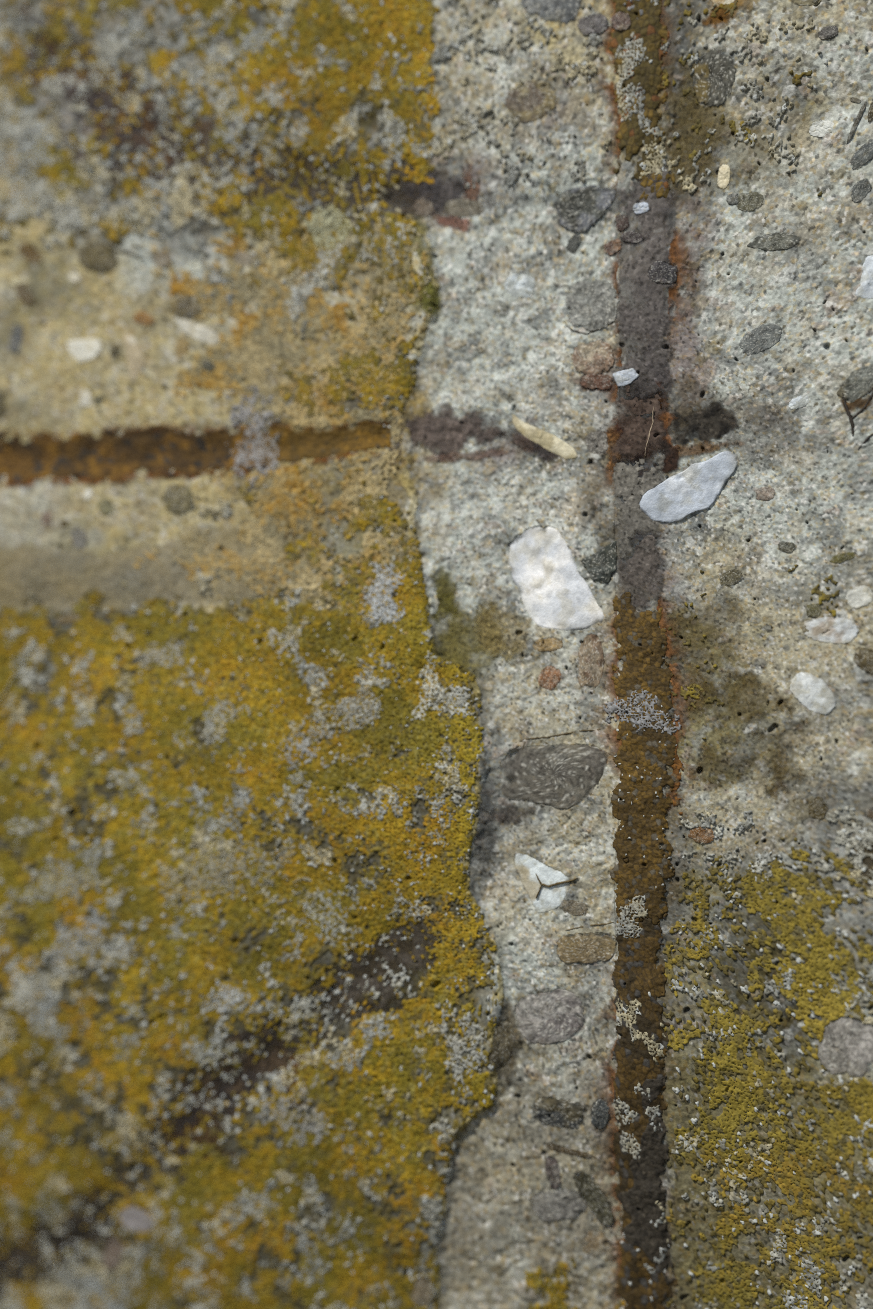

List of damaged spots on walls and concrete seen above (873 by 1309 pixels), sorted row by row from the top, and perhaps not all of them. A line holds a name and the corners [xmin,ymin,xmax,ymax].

rust [0,404,560,486]
rust [604,0,738,1309]